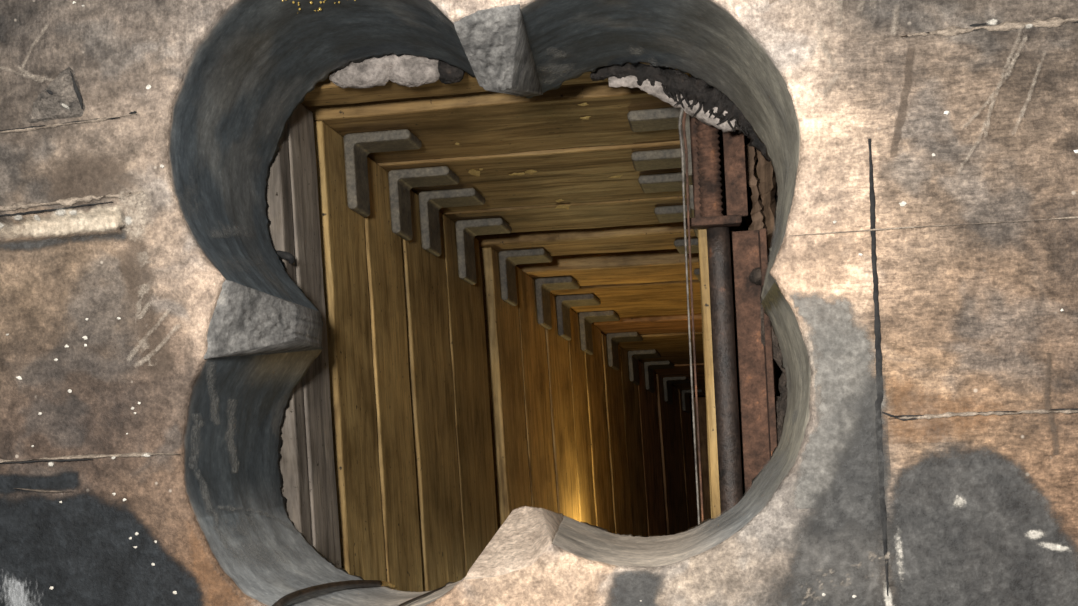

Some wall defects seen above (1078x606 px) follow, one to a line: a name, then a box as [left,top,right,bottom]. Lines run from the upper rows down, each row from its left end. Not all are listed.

spalling [454,4,573,97]
spalling [29,66,85,123]
crack [0,111,136,131]
spalling [204,280,322,359]
crack [868,138,924,596]
crack [0,457,93,465]